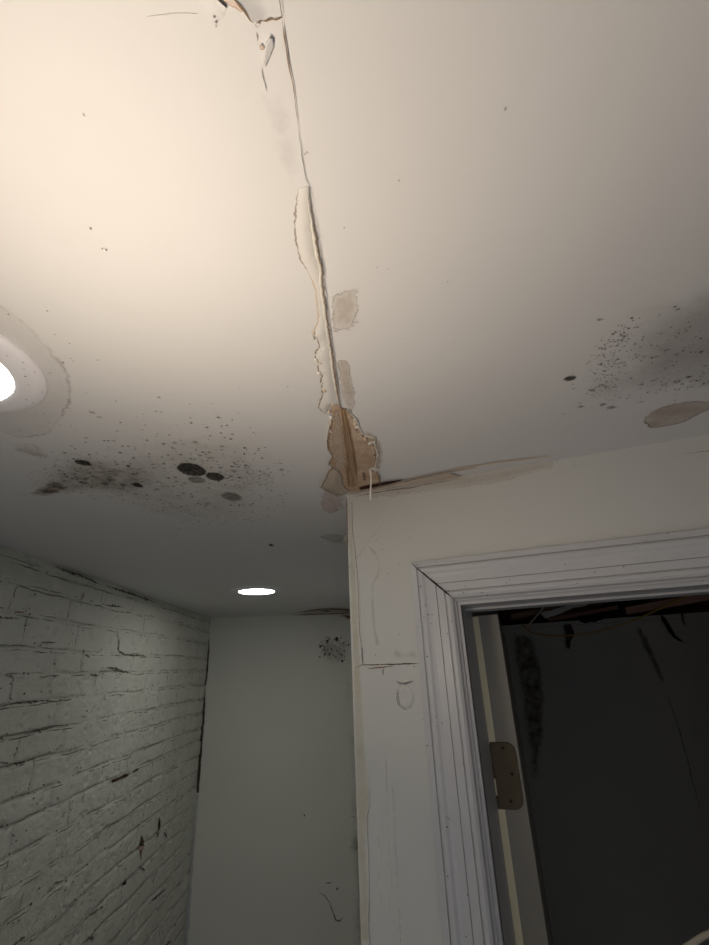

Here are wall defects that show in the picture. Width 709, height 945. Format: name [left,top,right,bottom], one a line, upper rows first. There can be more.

peeling [135,0,242,31]
crack [234,0,341,407]
leakage [48,440,150,504]
leakage [148,417,281,534]
flaking render [319,404,381,496]